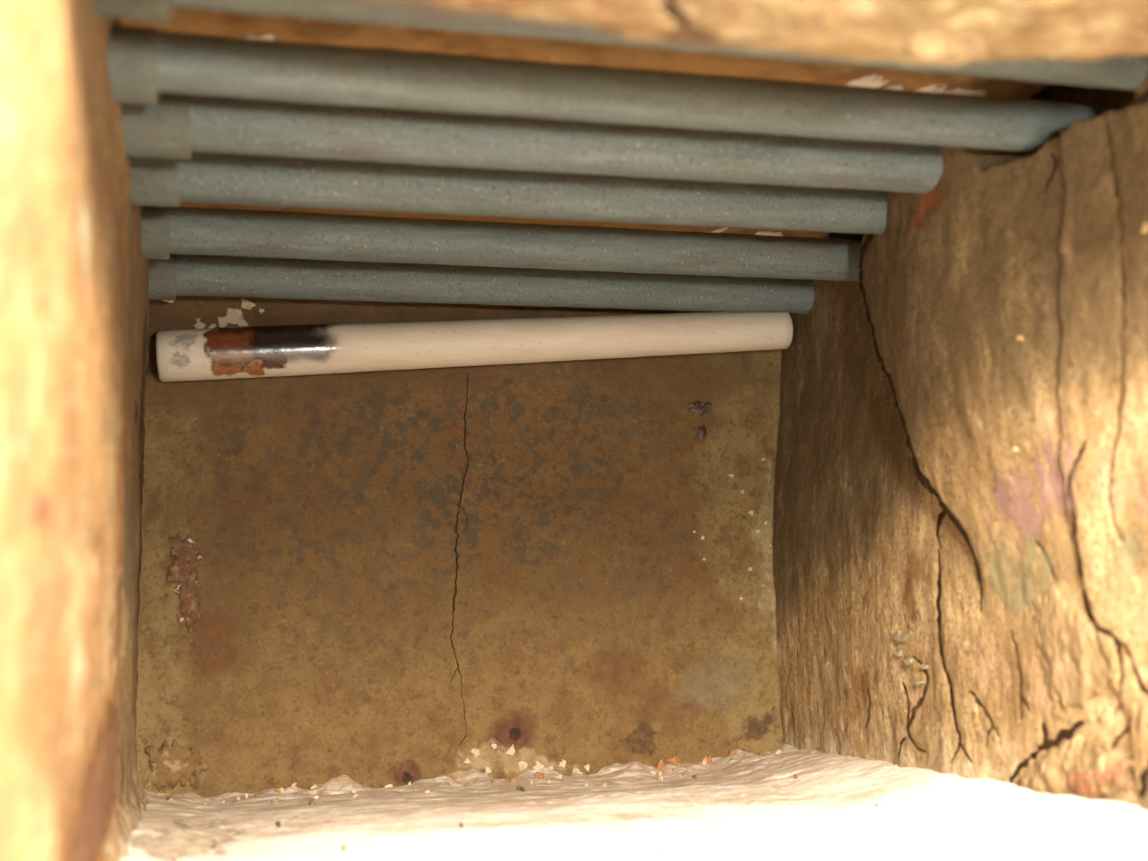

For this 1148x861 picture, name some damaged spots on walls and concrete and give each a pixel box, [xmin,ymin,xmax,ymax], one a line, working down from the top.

crack [659,0,689,30]
crack [1035,89,1148,749]
crack [450,375,469,745]
crack [859,234,1085,783]
rust [64,685,127,861]
rust [395,760,419,783]
rust [495,715,530,748]
crack [1139,767,1148,799]